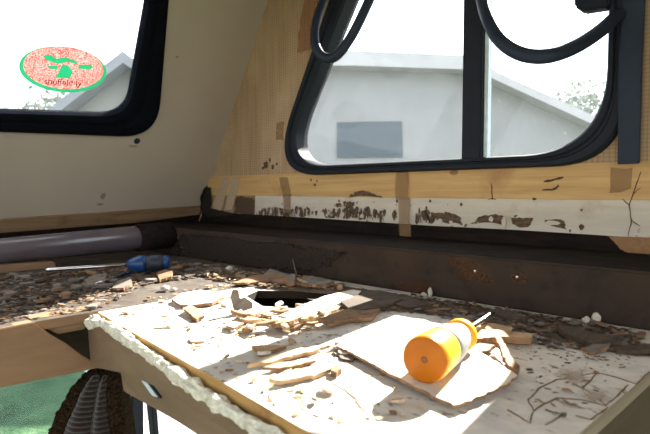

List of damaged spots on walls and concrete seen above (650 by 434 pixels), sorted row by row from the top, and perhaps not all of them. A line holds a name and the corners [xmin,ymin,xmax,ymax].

peeling [259,201,397,222]
peeling [415,206,462,225]
peeling [471,214,533,228]
peeling [544,219,565,229]
crack [624,172,641,236]
crack [507,371,650,425]